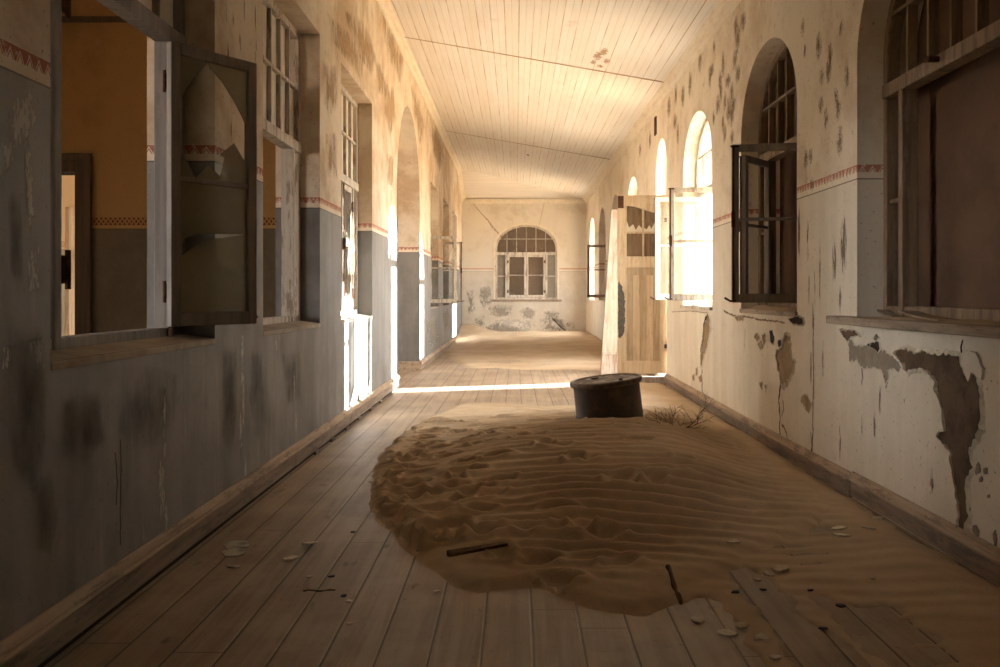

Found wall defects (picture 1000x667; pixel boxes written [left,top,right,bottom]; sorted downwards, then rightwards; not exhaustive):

water stain [667,13,746,143]
water stain [467,288,533,331]
water stain [544,311,568,331]
flaking render [692,314,712,393]
flaking render [724,310,805,436]
flaking render [801,392,812,414]
flaking render [839,328,997,546]
crack [114,440,122,545]